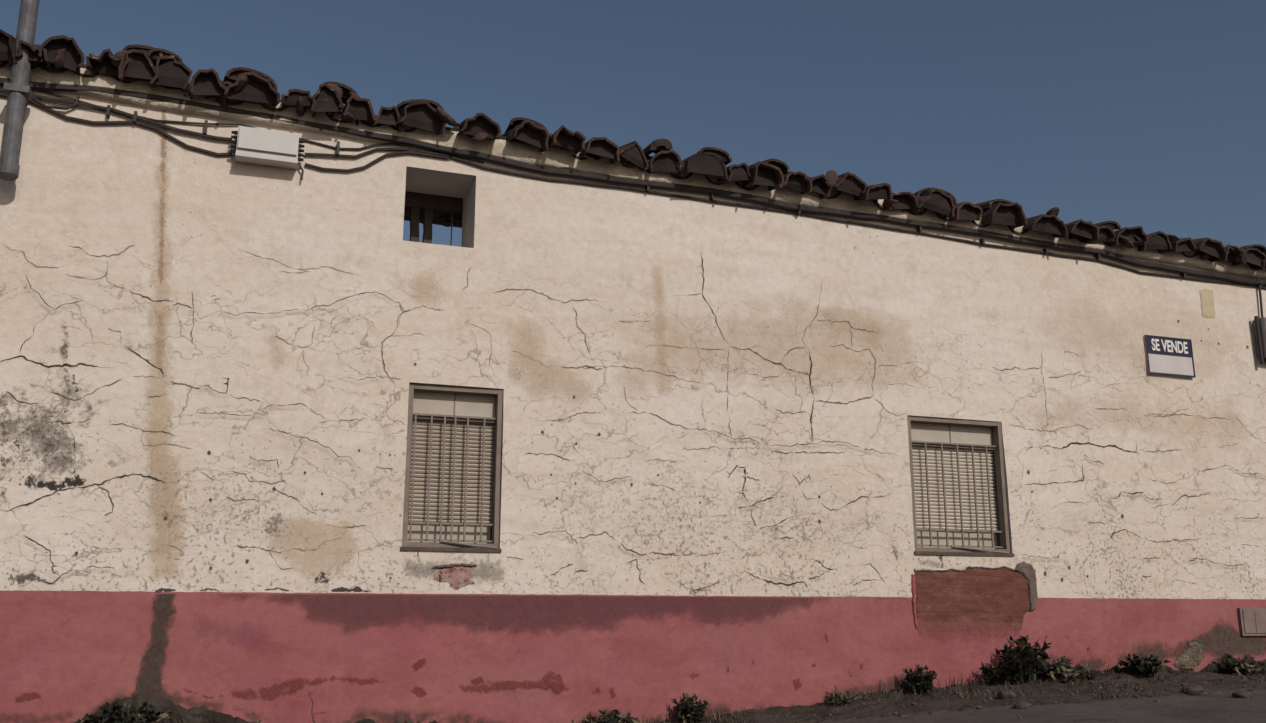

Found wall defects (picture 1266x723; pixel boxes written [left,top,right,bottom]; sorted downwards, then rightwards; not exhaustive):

water stain [147,113,179,573]
water stain [0,395,92,494]
crack [0,245,923,593]
crack [992,351,1266,584]
water stain [132,594,176,697]
spalling [70,677,378,723]
spalling [432,563,477,589]
peeling [461,671,565,694]
water stain [276,523,813,630]
peeling [911,561,1071,636]
spalling [1156,639,1238,674]